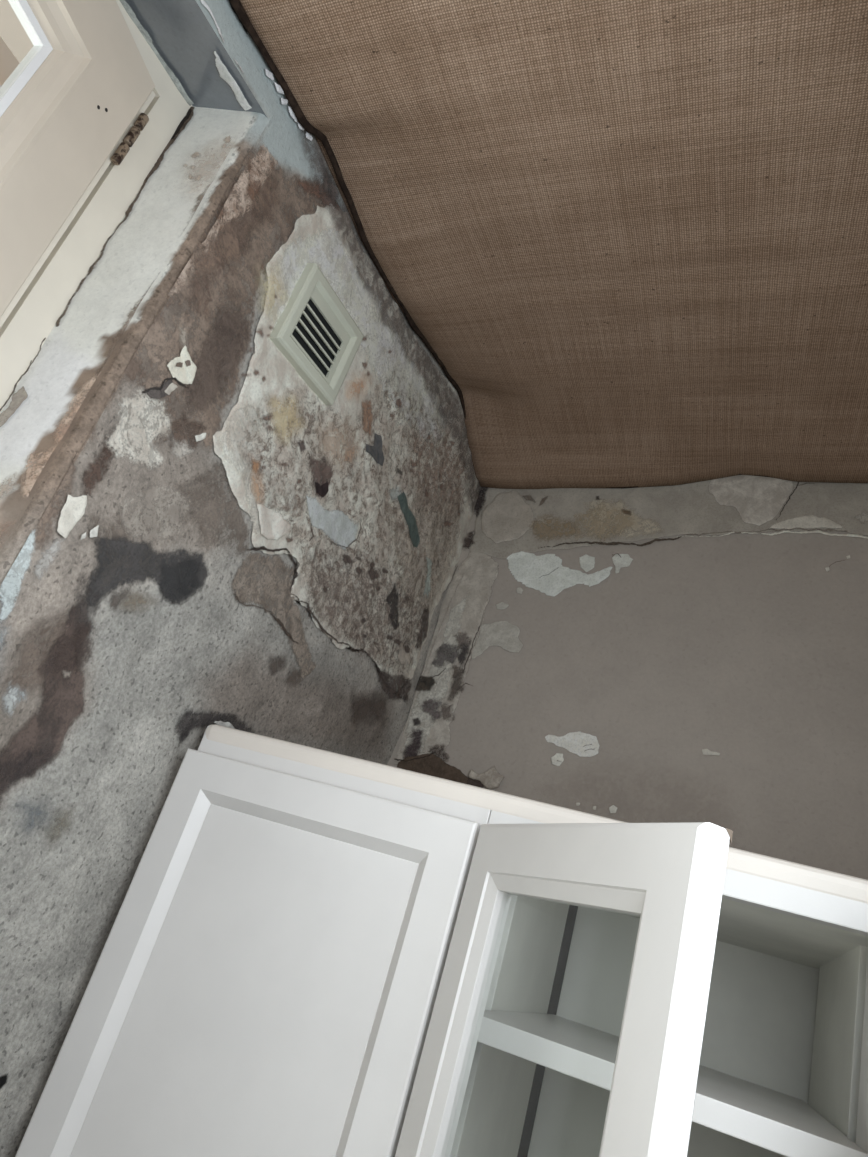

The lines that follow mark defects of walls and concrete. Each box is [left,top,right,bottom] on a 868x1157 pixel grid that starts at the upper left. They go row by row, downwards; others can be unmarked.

peeling [200,0,252,111]
peeling [265,68,313,141]
peeling [170,146,278,295]
spalling [0,338,46,427]
water stain [0,372,101,497]
water stain [0,424,116,620]
peeling [57,495,99,540]
peeling [95,281,154,378]
water stain [105,137,487,784]
peeling [107,181,868,766]
crack [541,482,868,548]
water stain [0,463,248,797]